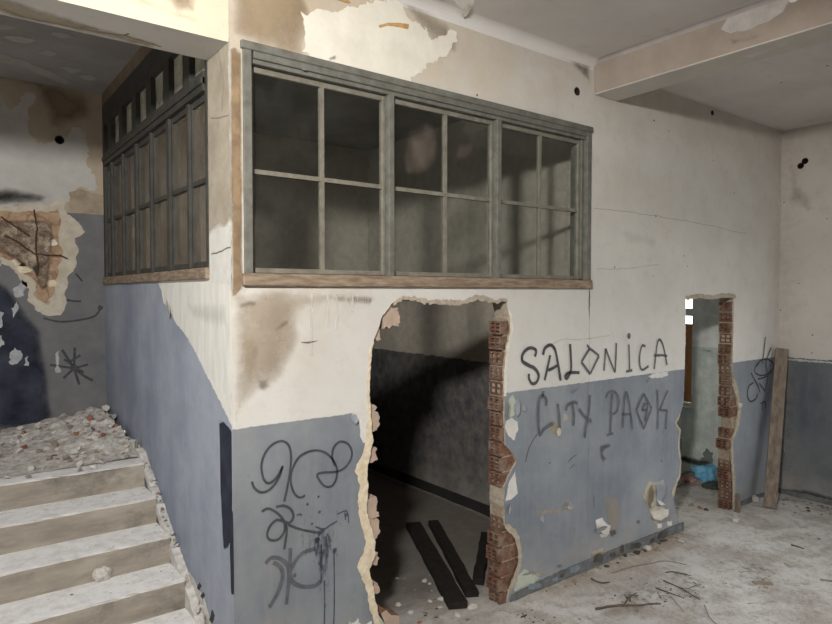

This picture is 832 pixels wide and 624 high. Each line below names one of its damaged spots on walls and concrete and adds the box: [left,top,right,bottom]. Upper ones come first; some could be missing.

damp [0,1,153,106]
peeling [301,0,458,81]
peeling [721,0,797,33]
spalling [0,92,103,347]
peeling [9,348,29,366]
flaking render [347,295,543,624]
peeling [591,414,681,563]